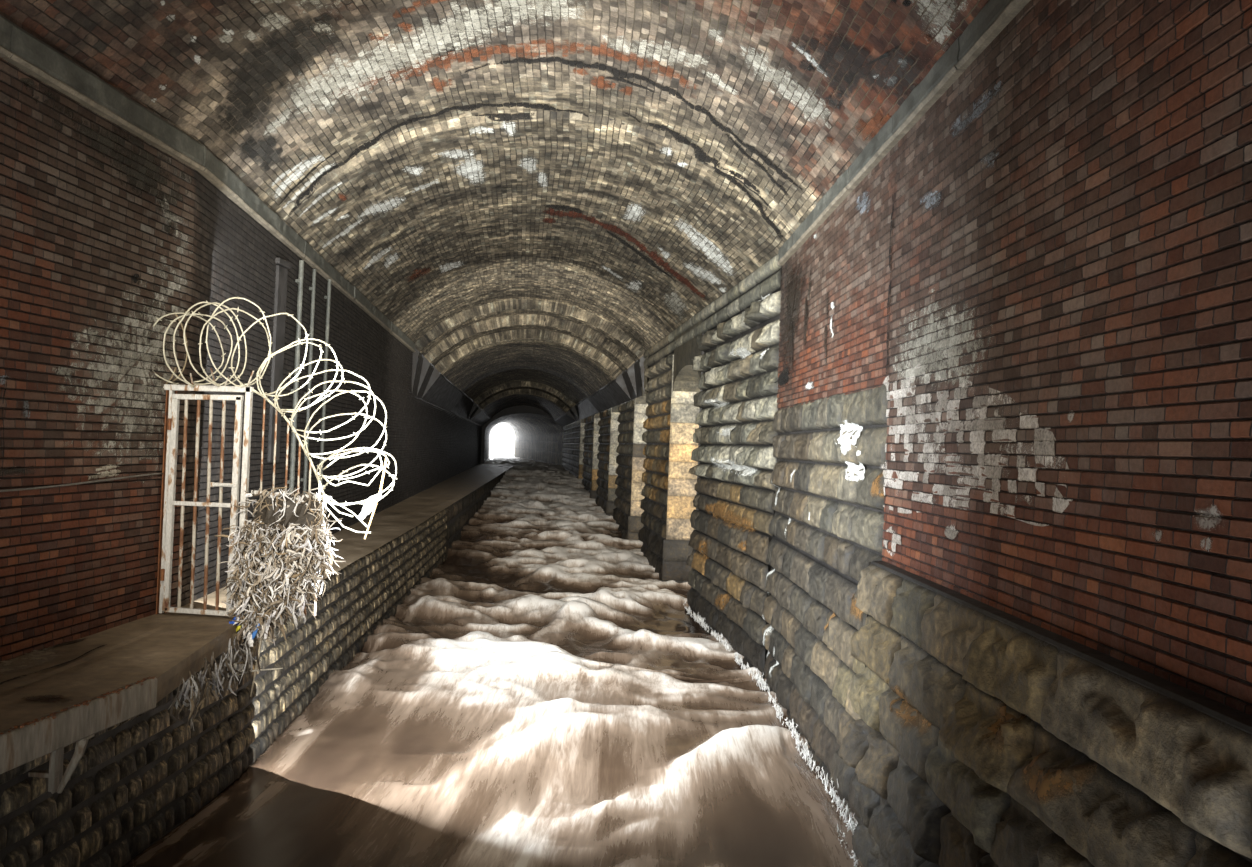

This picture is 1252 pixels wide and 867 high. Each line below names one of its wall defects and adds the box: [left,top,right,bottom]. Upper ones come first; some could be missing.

rust [330,39,696,97]
water stain [741,42,831,128]
crack [279,102,592,216]
crack [464,57,803,239]
water stain [160,198,187,253]
water stain [57,258,187,463]
water stain [881,291,1073,527]
water stain [883,527,901,556]
water stain [944,525,959,540]
water stain [1195,506,1220,550]